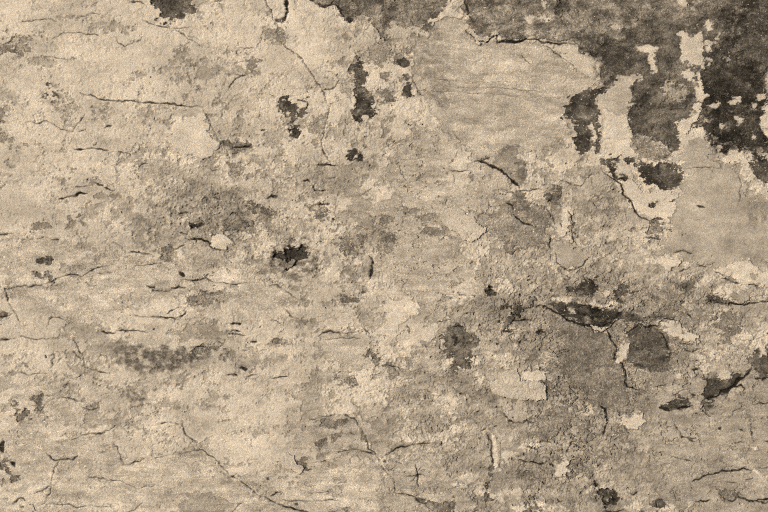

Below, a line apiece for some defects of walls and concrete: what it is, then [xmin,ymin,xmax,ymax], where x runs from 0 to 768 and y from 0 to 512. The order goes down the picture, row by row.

spalling [0,31,48,56]
spalling [151,0,197,25]
crack [258,0,289,44]
spalling [262,23,287,45]
peeling [0,108,28,152]
peeling [164,113,252,178]
spalling [277,89,328,138]
crack [303,116,336,205]
spalling [209,200,273,251]
spalling [305,202,335,223]
peeling [0,222,298,322]
crack [506,305,698,389]